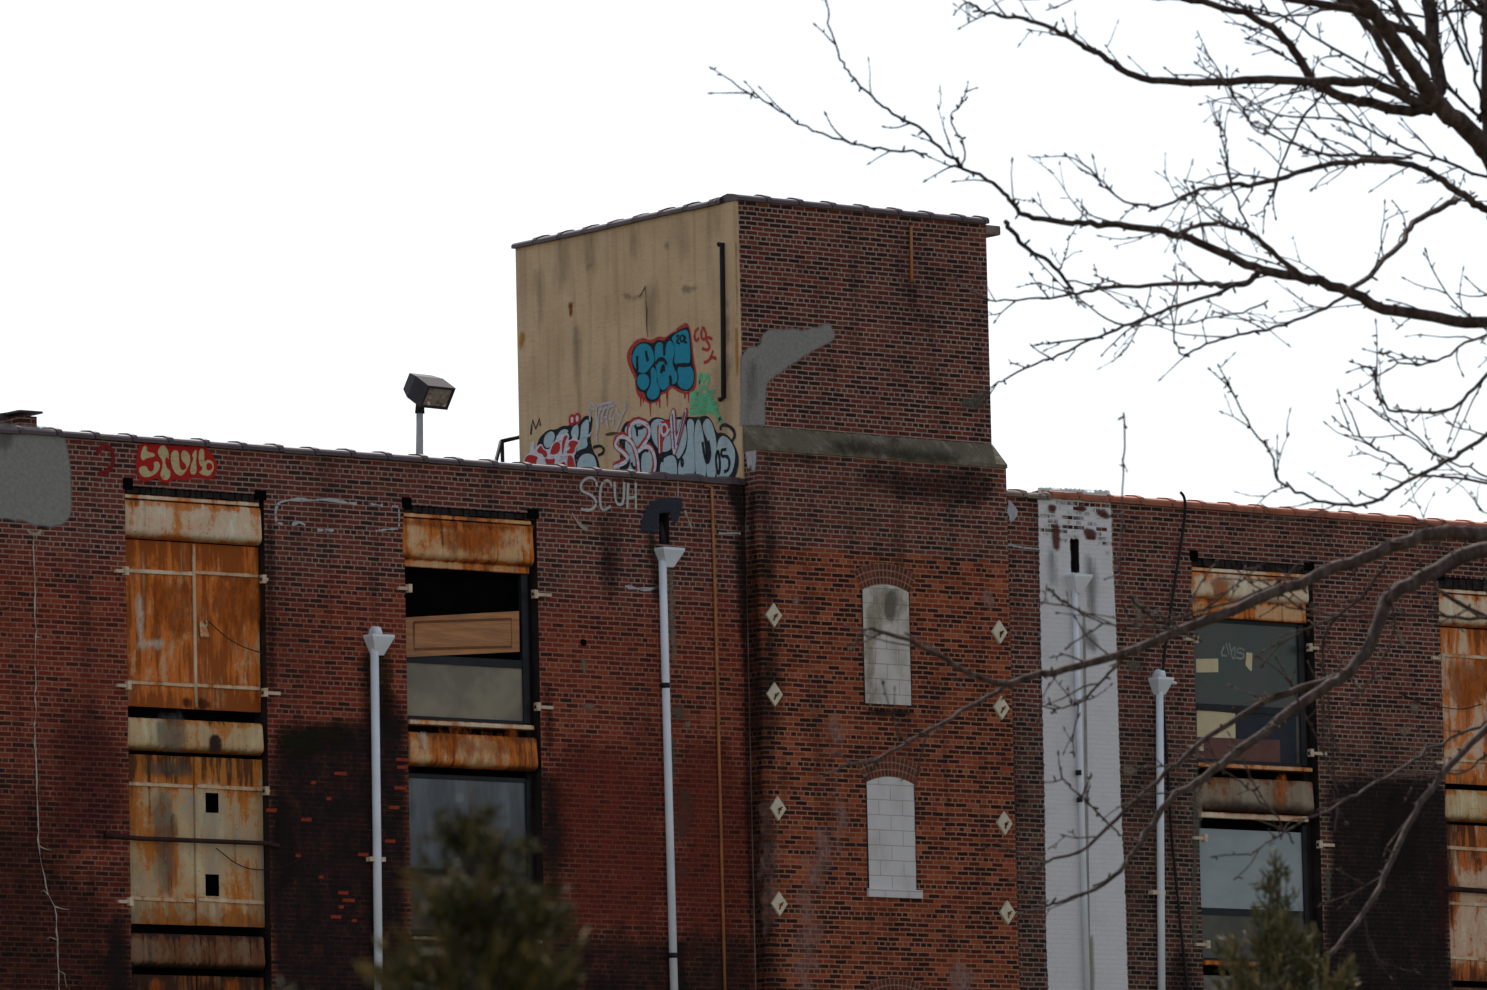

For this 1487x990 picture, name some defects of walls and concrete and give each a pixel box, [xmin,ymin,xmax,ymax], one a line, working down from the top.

peeling [1049,505,1060,550]
peeling [1077,506,1109,539]
corrosion [137,596,163,648]
corrosion [1449,654,1487,707]
corrosion [210,735,221,754]